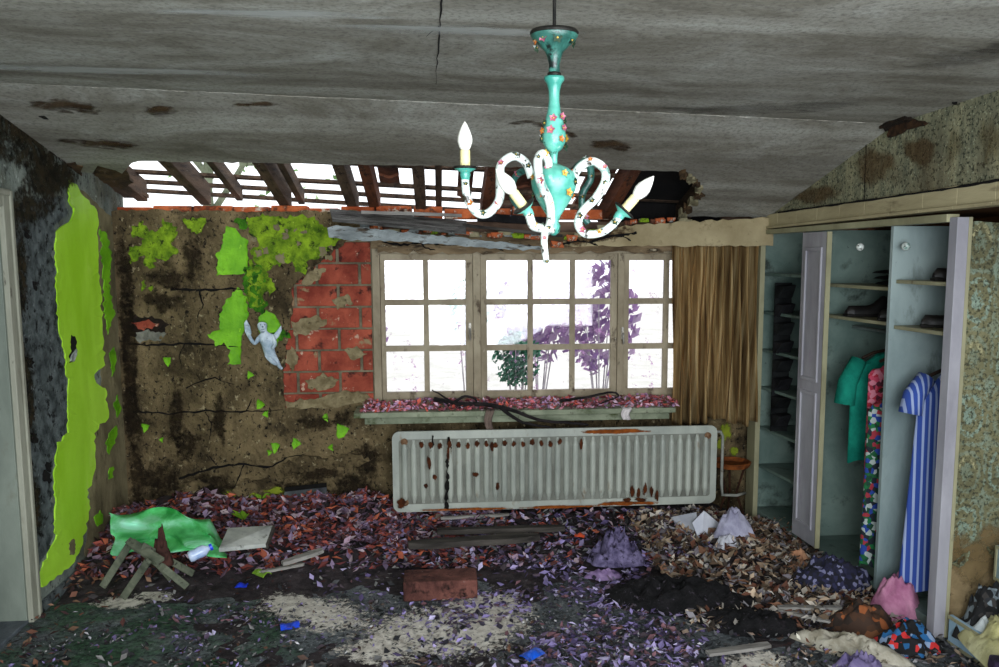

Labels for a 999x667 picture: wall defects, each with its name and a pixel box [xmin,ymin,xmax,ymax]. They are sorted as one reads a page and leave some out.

crack [426,0,443,83]
damp [30,99,95,114]
damp [59,139,138,148]
damp [0,114,79,322]
peeling [215,226,249,276]
peeling [678,169,705,218]
crack [170,287,244,318]
damp [23,342,36,439]
peeling [15,162,170,587]
crack [129,342,306,490]
spalling [207,240,375,473]
damp [32,462,42,544]